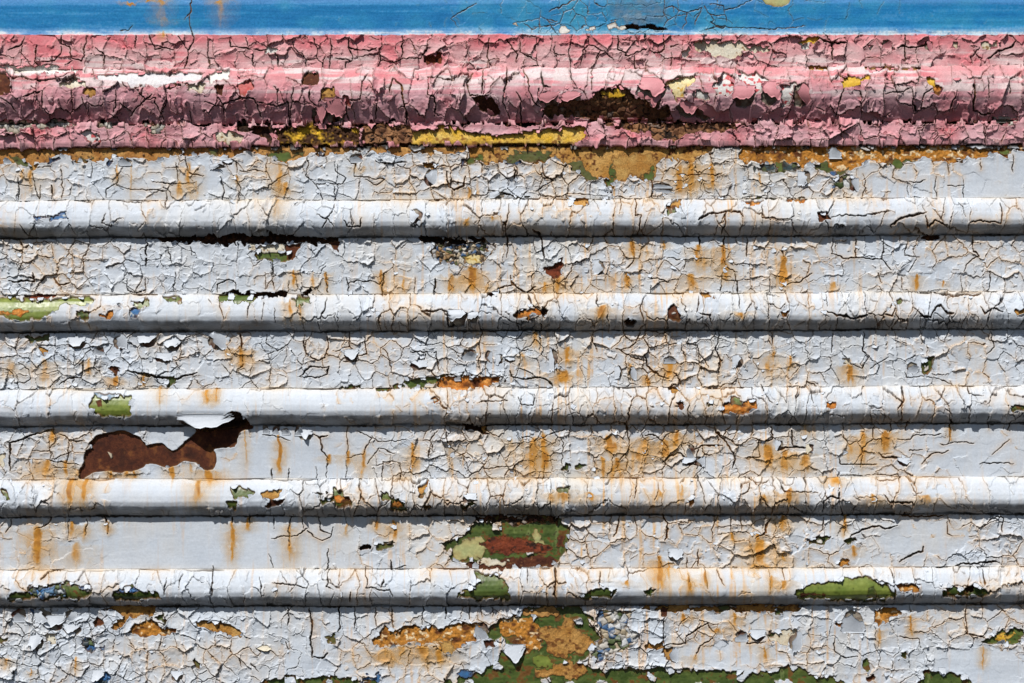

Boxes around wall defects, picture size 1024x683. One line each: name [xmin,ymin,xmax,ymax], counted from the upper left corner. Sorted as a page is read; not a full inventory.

crack [115,0,847,122]
crack [217,263,482,378]
crack [592,168,1010,589]
corrosion [35,411,254,505]
corrosion [600,435,621,477]
corrosion [763,444,810,471]
corrosion [30,526,46,566]
peeling [0,580,111,683]
crack [232,515,405,659]
peeling [428,437,570,602]
peeling [444,583,844,683]
peeling [795,576,896,639]